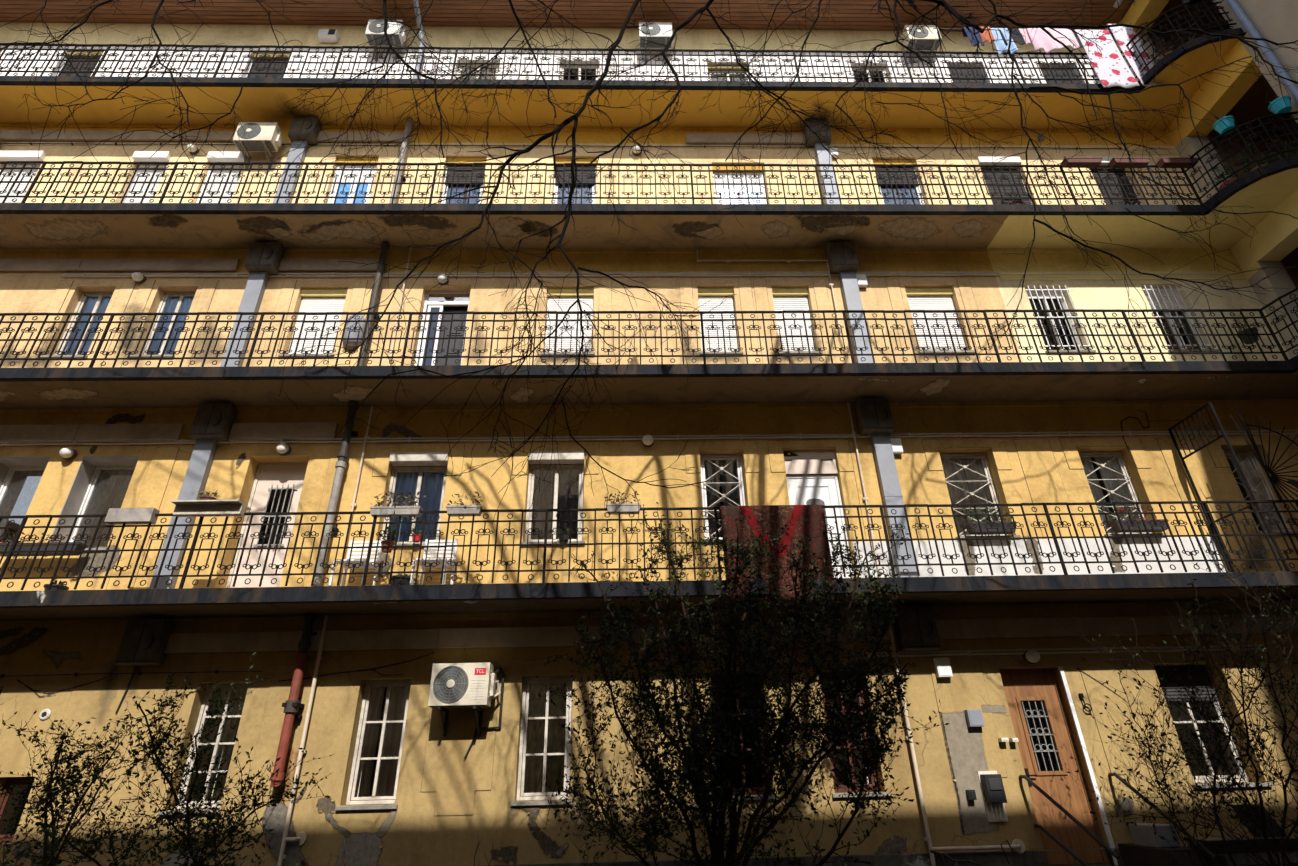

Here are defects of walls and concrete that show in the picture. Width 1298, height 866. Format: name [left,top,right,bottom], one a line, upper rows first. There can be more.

flaking render [316,795,354,837]
flaking render [522,806,568,858]
flaking render [491,846,518,865]